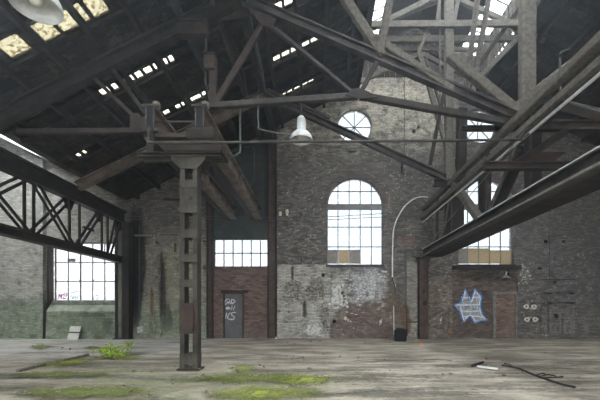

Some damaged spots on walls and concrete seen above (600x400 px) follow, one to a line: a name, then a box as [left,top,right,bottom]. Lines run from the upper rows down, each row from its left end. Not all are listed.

peeling [279,270,387,337]